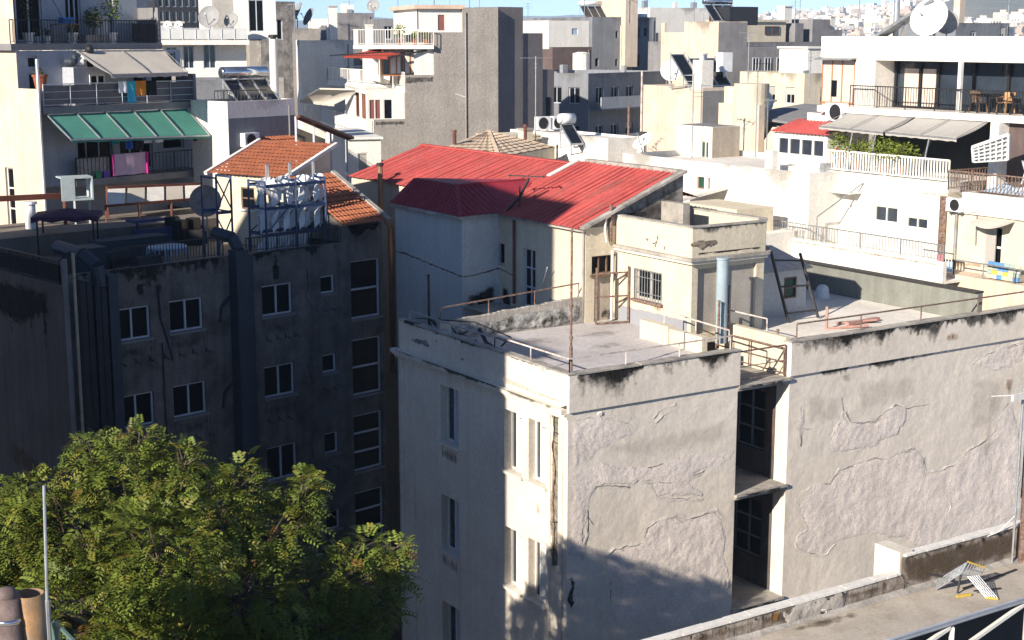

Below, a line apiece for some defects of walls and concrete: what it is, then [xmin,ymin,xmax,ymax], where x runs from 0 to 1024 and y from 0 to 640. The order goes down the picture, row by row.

crack [396,251,513,277]
water stain [0,281,47,345]
water stain [800,308,1024,348]
water stain [578,365,644,388]
water stain [699,352,731,365]
spalling [794,401,1022,558]
spalling [550,405,733,635]